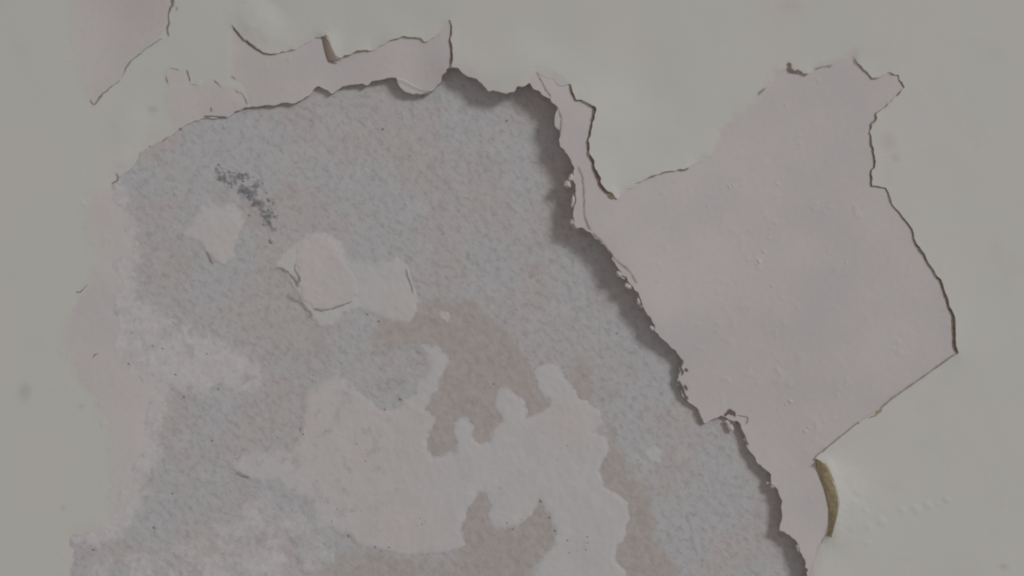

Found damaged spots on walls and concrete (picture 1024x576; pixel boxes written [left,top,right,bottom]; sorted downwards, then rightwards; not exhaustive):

crack [90,0,178,105]
crack [233,28,293,55]
crack [447,24,455,64]
flaking render [119,20,958,576]
crack [787,58,957,456]